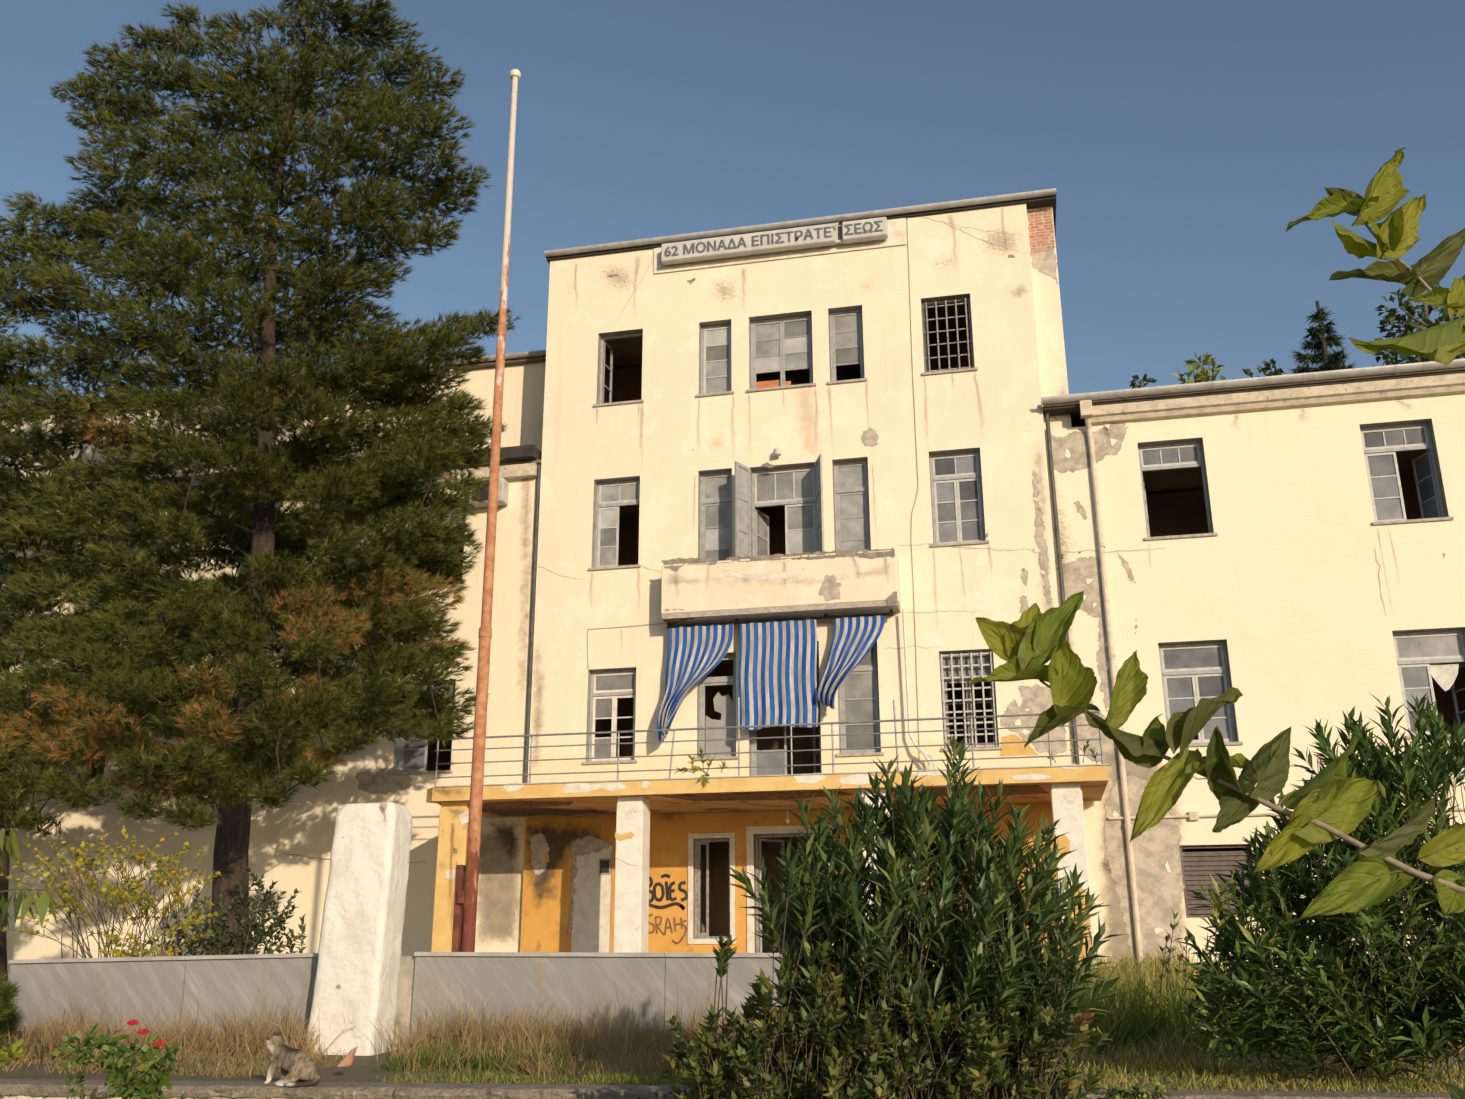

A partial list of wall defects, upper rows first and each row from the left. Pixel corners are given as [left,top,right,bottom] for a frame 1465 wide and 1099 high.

spalling [661,548,895,601]
peeling [911,422,1185,966]
spalling [459,779,650,825]
spalling [664,773,883,801]
peeling [530,832,550,876]
damp [479,808,614,937]
peeling [568,832,634,937]